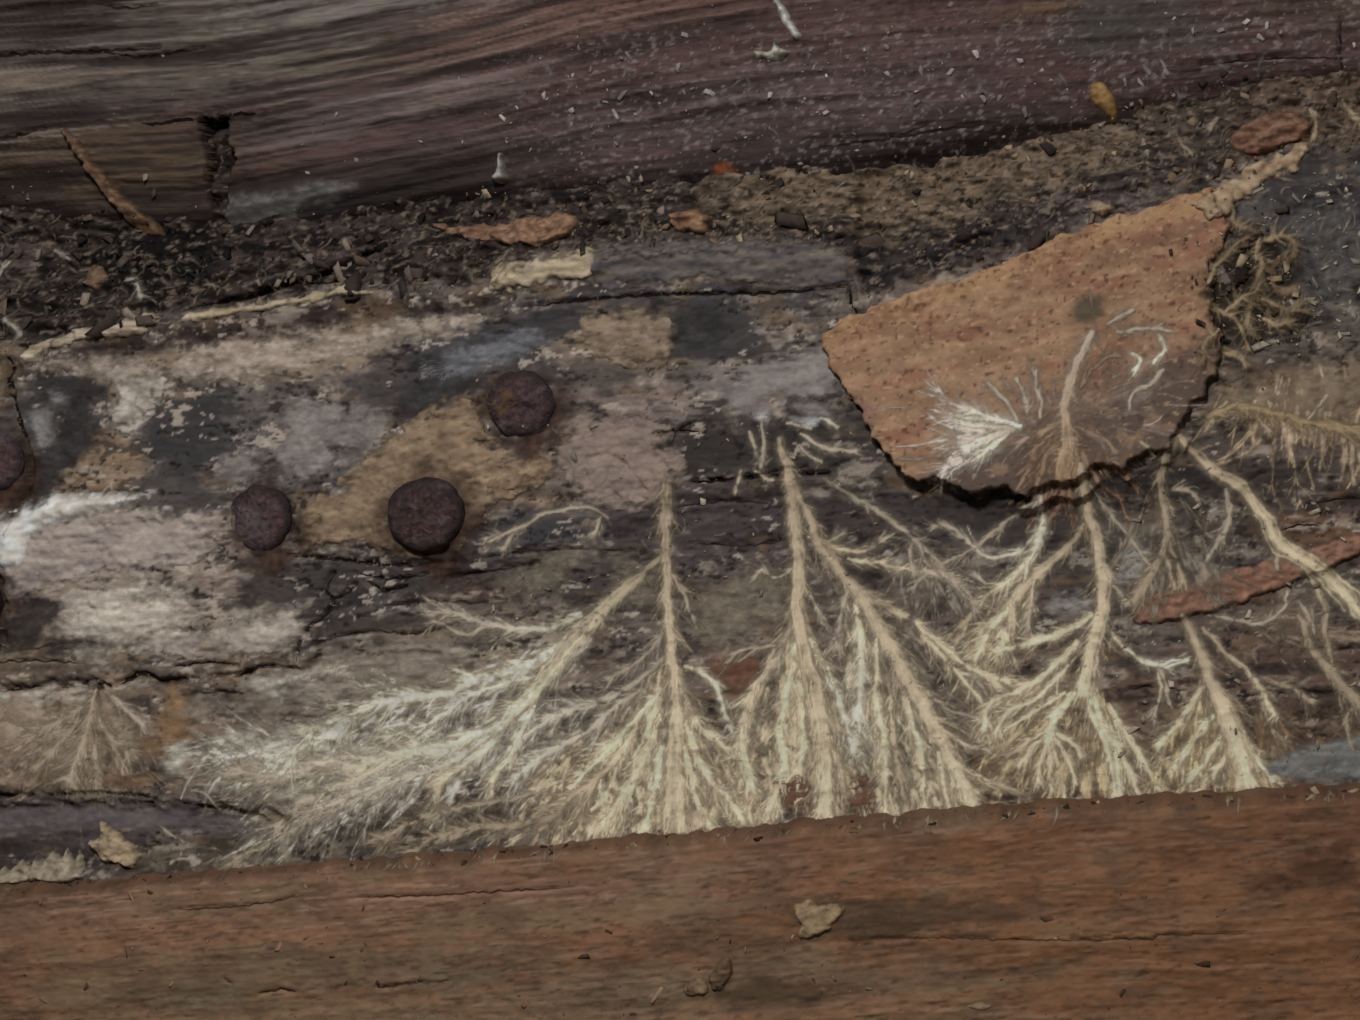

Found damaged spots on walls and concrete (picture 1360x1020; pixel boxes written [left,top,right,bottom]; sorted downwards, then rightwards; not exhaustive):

crack [143,111,258,205]
corrosion [0,438,41,517]
crack [692,539,786,547]
corrosion [0,574,17,624]
water stain [0,574,193,655]
water stain [244,611,298,648]
crack [0,547,634,694]
water stain [254,638,474,707]
water stain [711,655,759,692]
water stain [1268,727,1360,781]
water stain [776,778,811,804]
water stain [848,775,876,813]